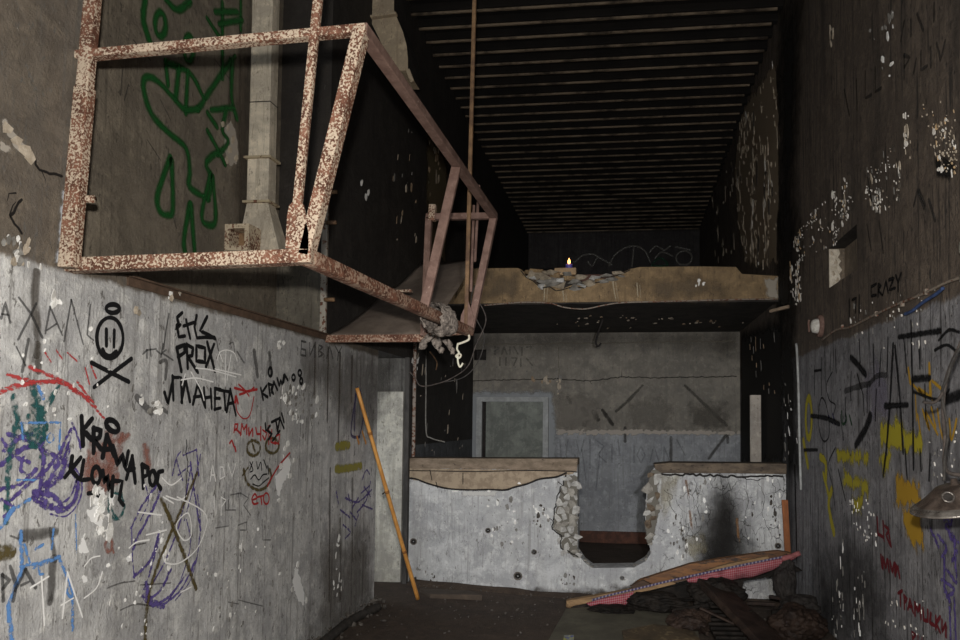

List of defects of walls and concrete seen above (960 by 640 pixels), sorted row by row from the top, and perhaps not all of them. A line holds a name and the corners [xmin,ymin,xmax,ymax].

flaking render [0,119,36,165]
flaking render [921,101,957,178]
flaking render [790,178,853,305]
spalling [520,268,631,291]
crack [473,373,737,384]
crack [661,473,783,544]